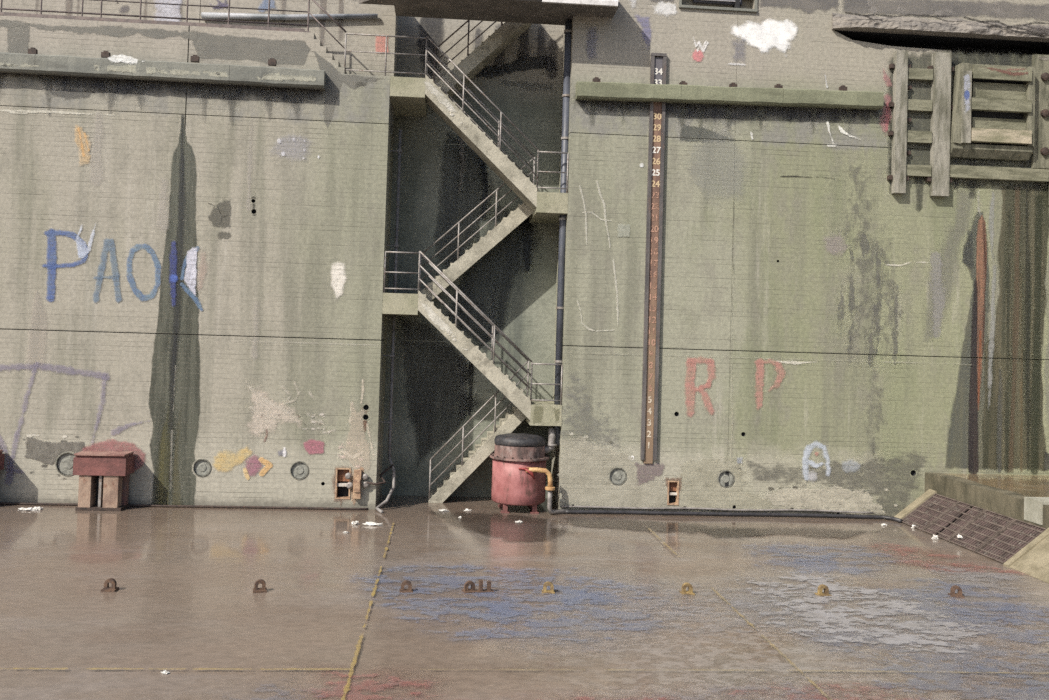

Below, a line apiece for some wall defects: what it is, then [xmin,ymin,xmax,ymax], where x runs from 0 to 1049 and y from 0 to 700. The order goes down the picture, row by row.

damp [0,0,378,127]
damp [579,100,649,118]
damp [665,60,893,142]
damp [906,51,1033,211]
damp [149,116,200,505]
damp [404,322,478,458]
rust [968,216,987,474]
damp [946,178,1049,474]